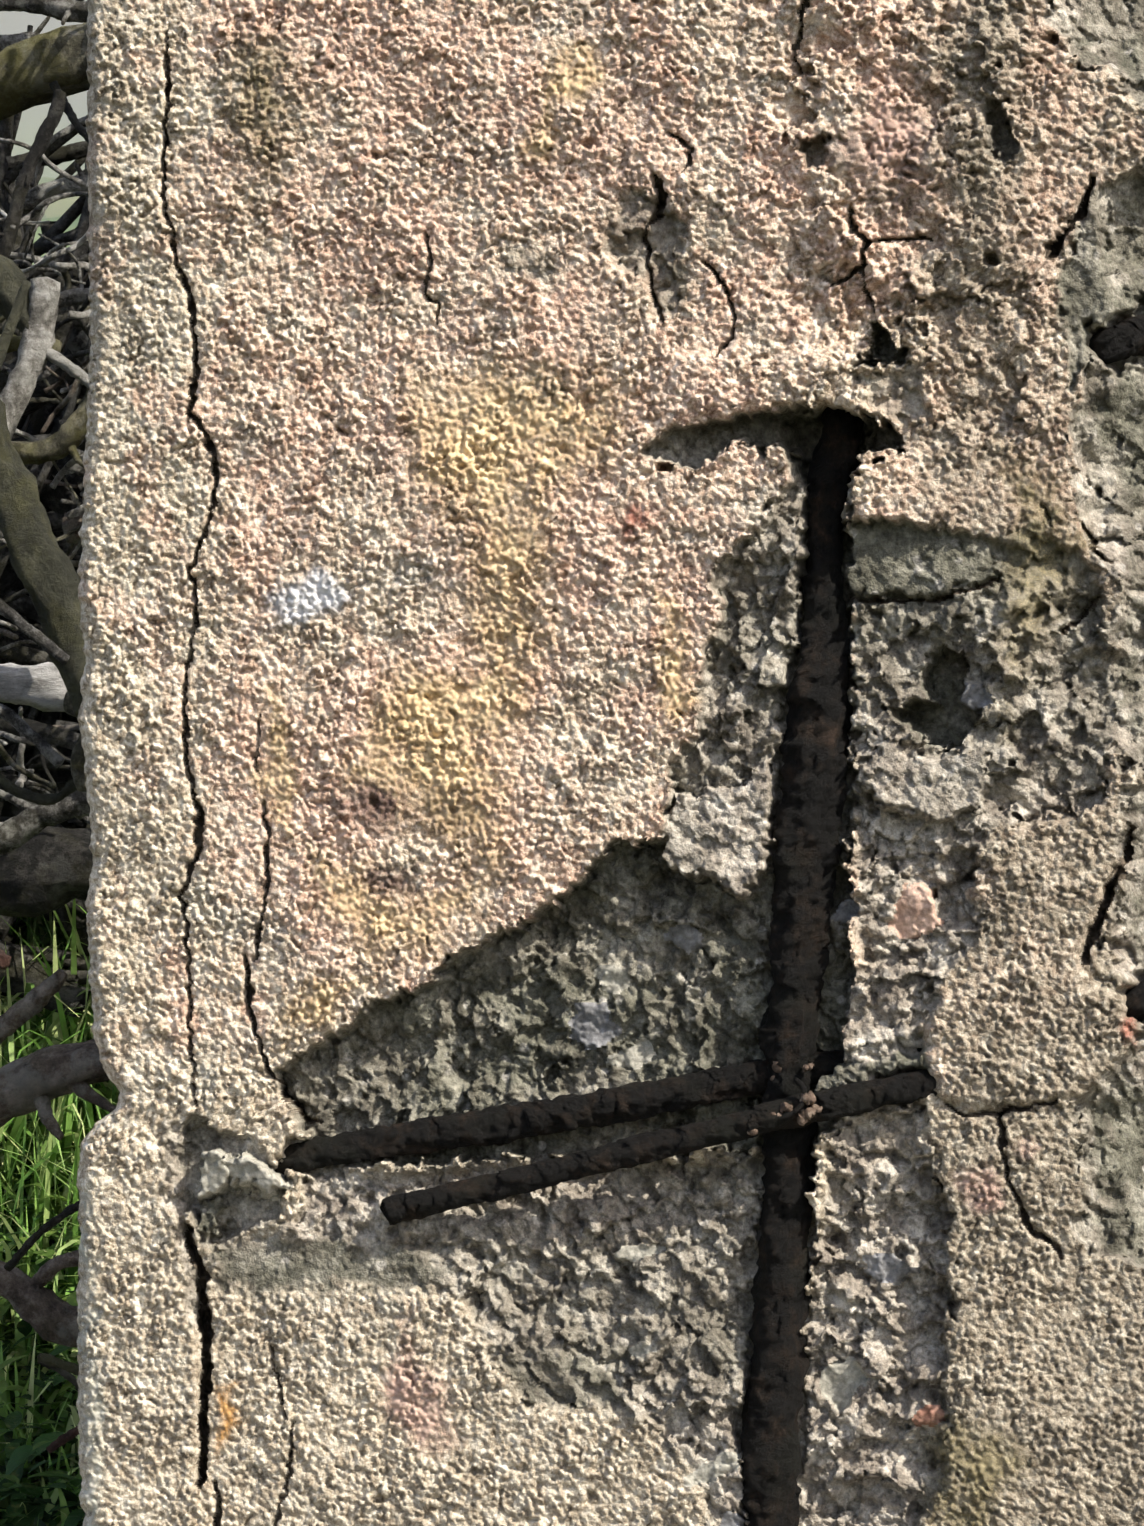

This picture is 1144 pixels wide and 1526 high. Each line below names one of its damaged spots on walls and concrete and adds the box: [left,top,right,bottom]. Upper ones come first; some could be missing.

crack [643,134,694,324]
crack [829,207,933,308]
spalling [979,97,1021,167]
spalling [1040,0,1144,111]
crack [159,33,220,1106]
spalling [270,167,1144,1141]
crack [245,714,322,1124]
crack [184,1224,223,1526]
spalling [163,1093,766,1526]
spalling [796,1098,960,1526]
crack [945,1097,1063,1260]
spalling [1067,1024,1144,1269]